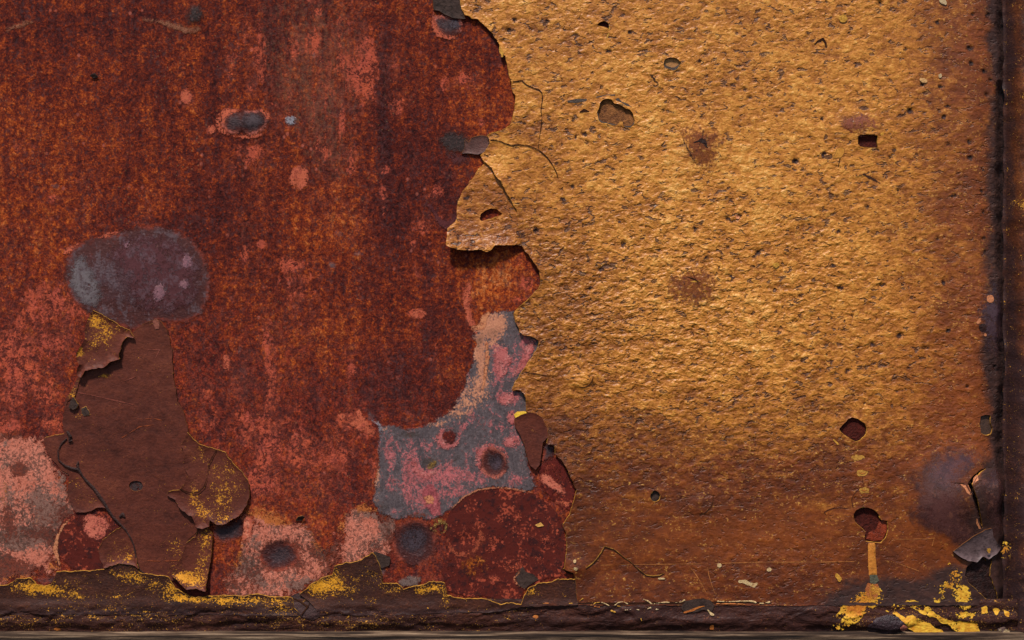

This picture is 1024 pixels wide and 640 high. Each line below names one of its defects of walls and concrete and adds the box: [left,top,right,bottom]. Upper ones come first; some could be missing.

crack [487,79,559,181]
corrosion [0,0,576,599]
peeling [294,0,1009,632]
peeling [0,309,538,616]
crack [954,467,992,529]
crack [544,546,685,621]
crack [712,598,770,606]